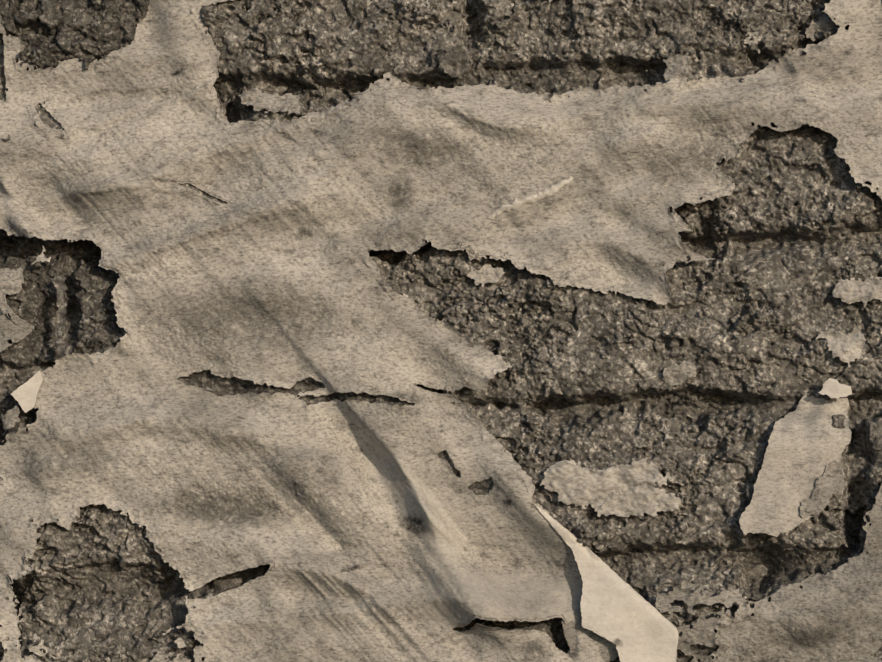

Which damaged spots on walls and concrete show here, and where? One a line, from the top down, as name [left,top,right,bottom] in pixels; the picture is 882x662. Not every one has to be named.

peeling [0,0,350,178]
spalling [200,0,840,123]
spalling [0,229,128,445]
crack [177,370,443,407]
spalling [368,124,882,662]
spalling [12,504,215,662]
crack [189,564,270,597]
crack [452,618,570,654]